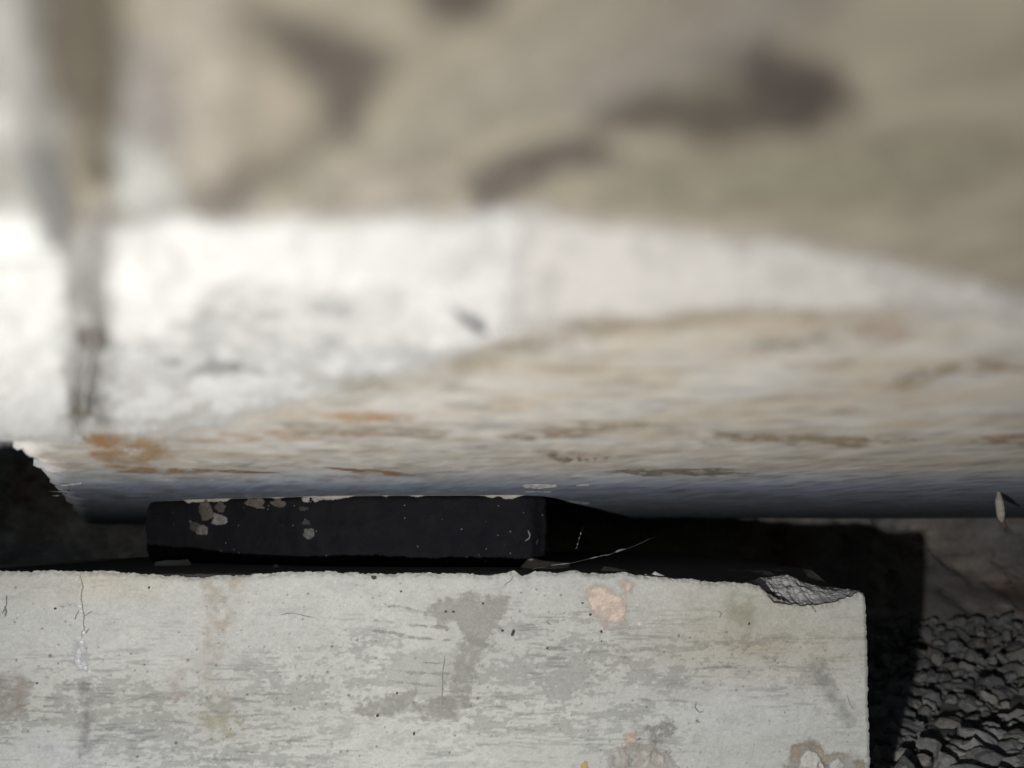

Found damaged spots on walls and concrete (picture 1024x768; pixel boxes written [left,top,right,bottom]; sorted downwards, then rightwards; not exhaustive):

crack [73,576,92,672]
damp [356,593,509,719]
spalling [746,575,861,605]